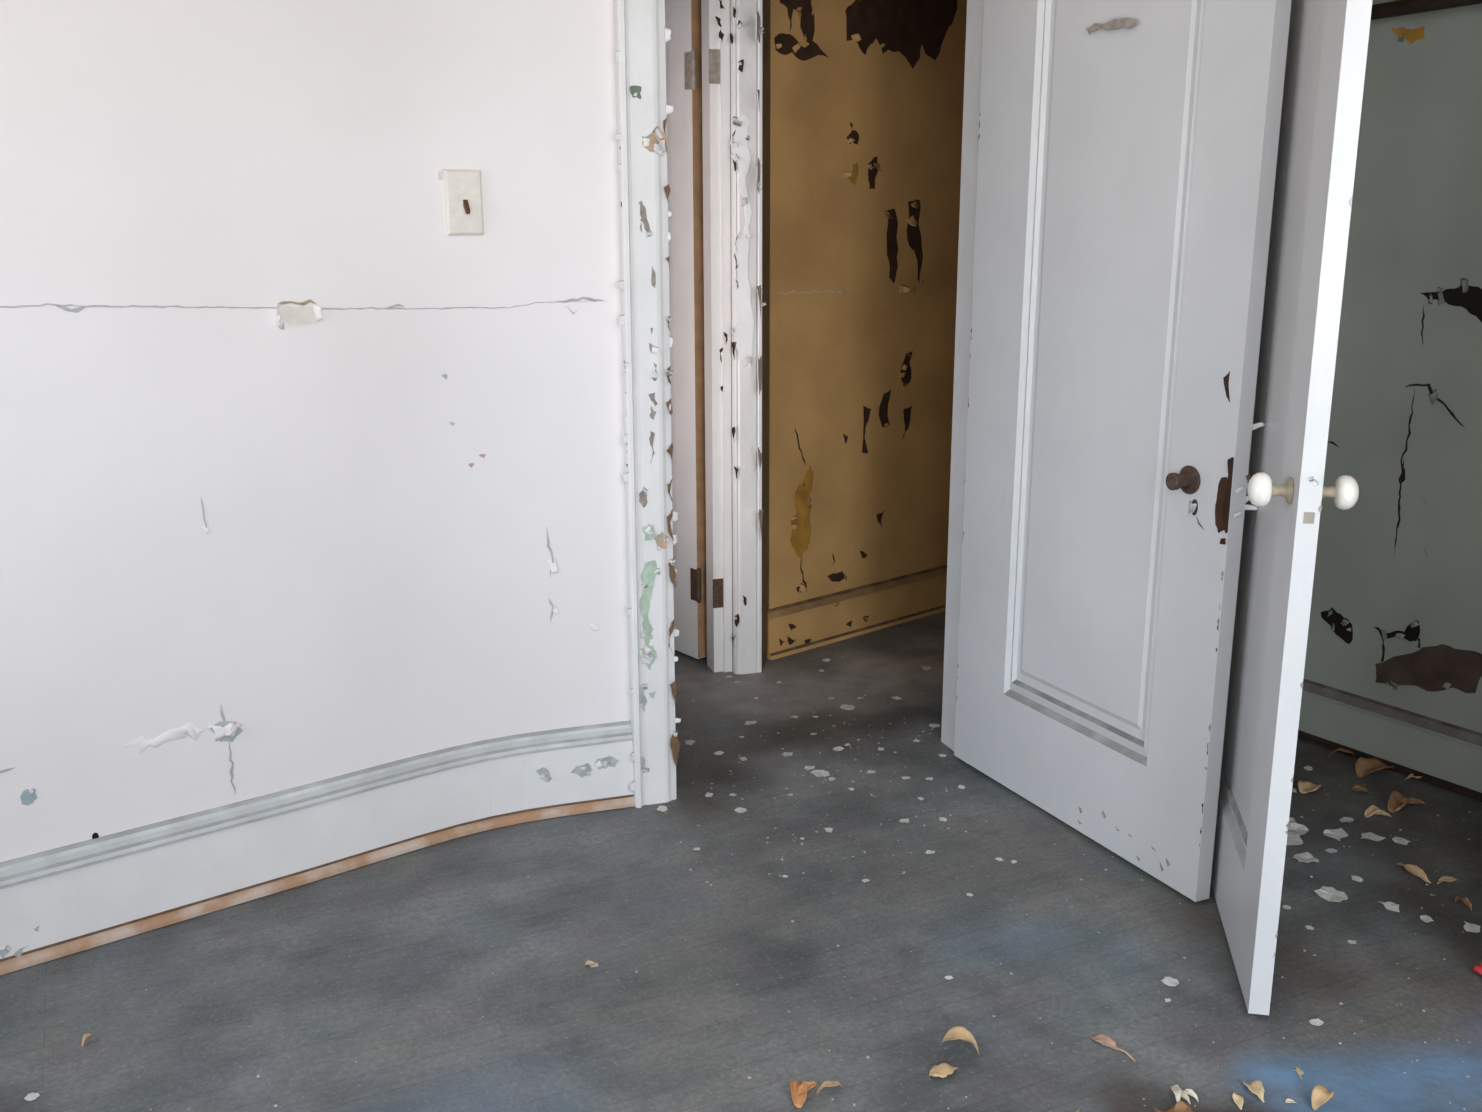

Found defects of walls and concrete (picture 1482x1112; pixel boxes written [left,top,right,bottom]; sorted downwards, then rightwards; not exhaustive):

peeling [715,0,829,61]
peeling [845,0,957,69]
peeling [884,200,923,283]
crack [0,303,277,313]
crack [321,297,604,315]
crack [1419,306,1427,349]
spalling [1420,278,1482,335]
peeling [843,351,913,453]
crack [1394,383,1465,556]
peeling [627,478,681,766]
spalling [1321,607,1353,644]
peeling [1374,619,1482,693]